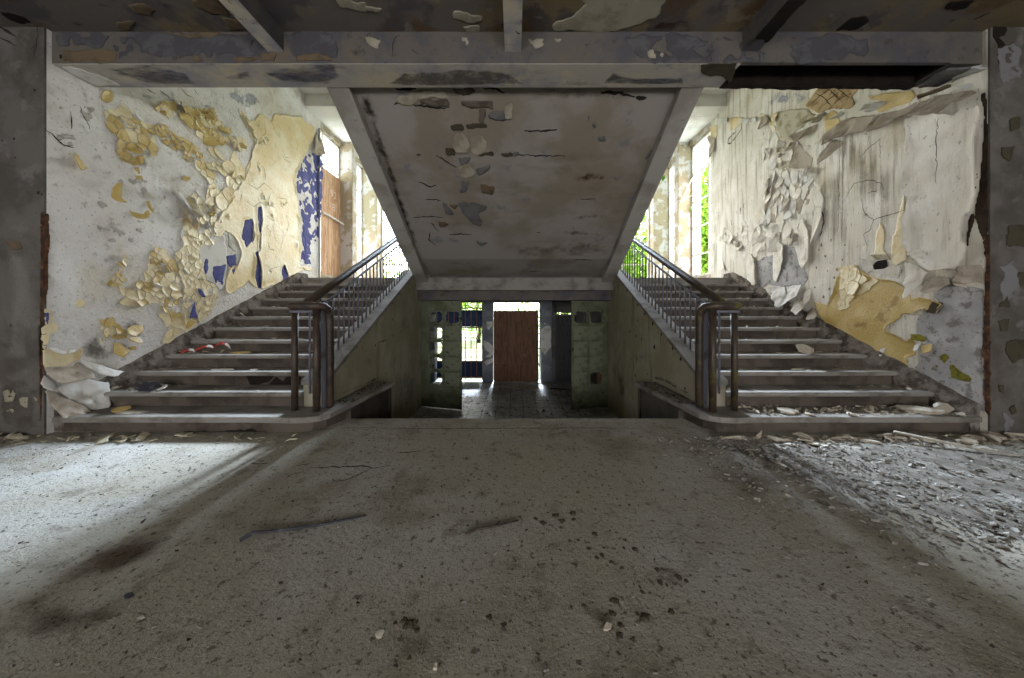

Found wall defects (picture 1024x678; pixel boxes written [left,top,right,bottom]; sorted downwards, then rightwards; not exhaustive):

peeling [284,31,338,62]
peeling [453,11,483,45]
peeling [528,0,666,49]
peeling [56,0,323,344]
peeling [396,87,519,227]
crack [820,138,904,245]
peeling [701,27,1024,412]
crack [933,113,941,182]
corrosion [39,212,50,421]
peeling [100,317,144,358]
corrosion [982,235,991,415]
crack [252,428,498,481]